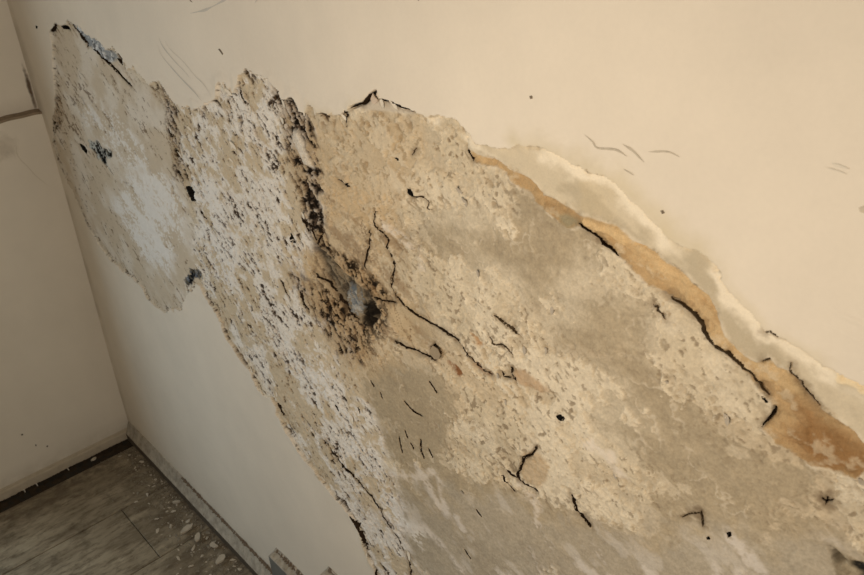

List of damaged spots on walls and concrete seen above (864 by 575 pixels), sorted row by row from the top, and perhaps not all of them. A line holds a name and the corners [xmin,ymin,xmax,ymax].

peeling [49,24,464,575]
crack [281,280,309,310]
crack [301,217,360,320]
crack [364,211,520,381]
peeling [303,94,864,575]
crack [399,401,433,458]
crack [501,447,539,492]
crack [571,494,591,527]